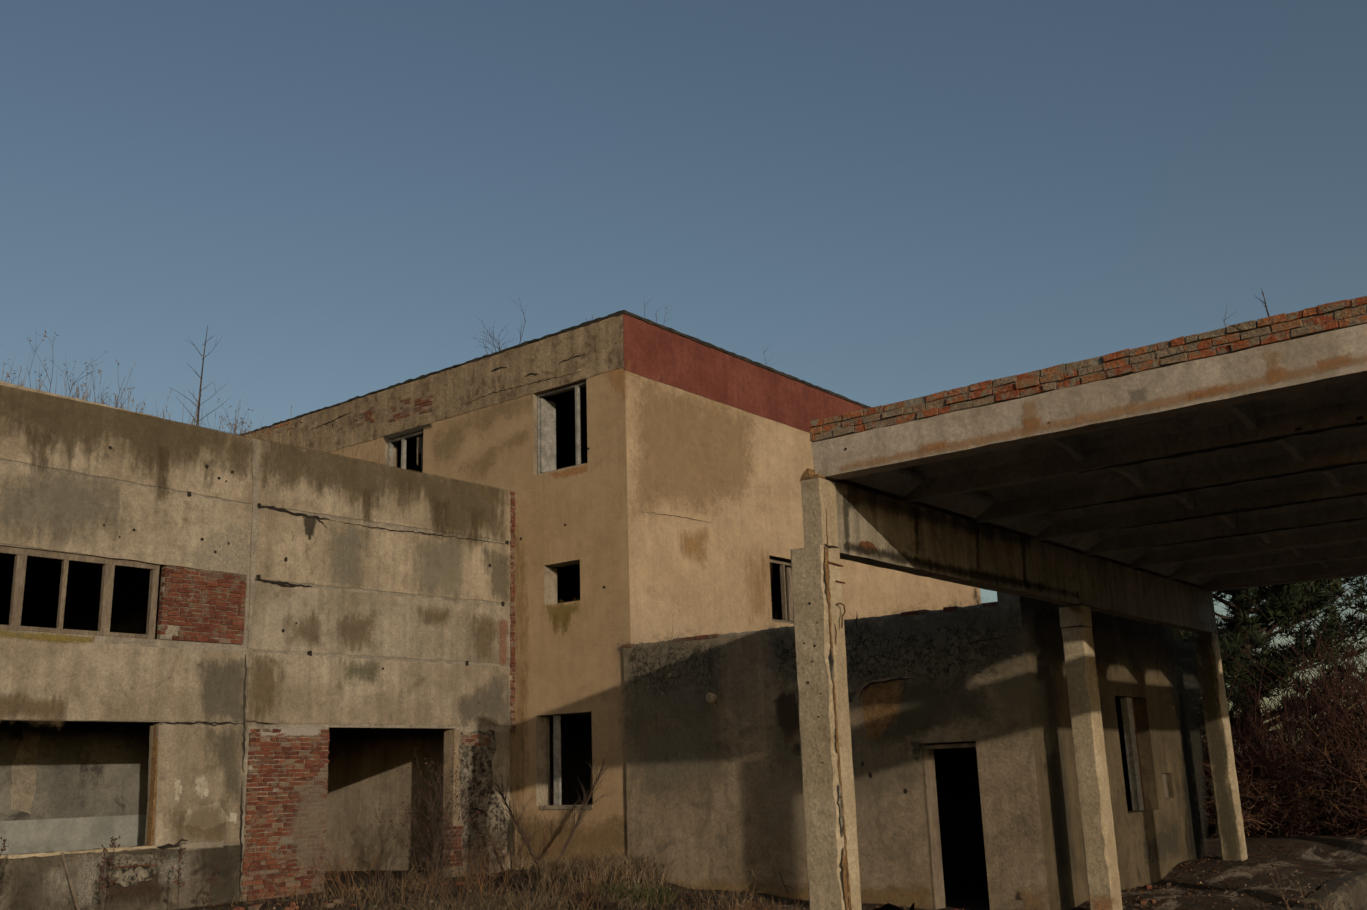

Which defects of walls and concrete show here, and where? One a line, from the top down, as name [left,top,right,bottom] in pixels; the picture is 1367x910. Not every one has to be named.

leakage [0,385,510,600]
crack [261,506,510,545]
peeling [443,730,508,867]
leakage [770,629,801,758]
spalling [774,509,866,910]
leakage [844,487,1207,864]